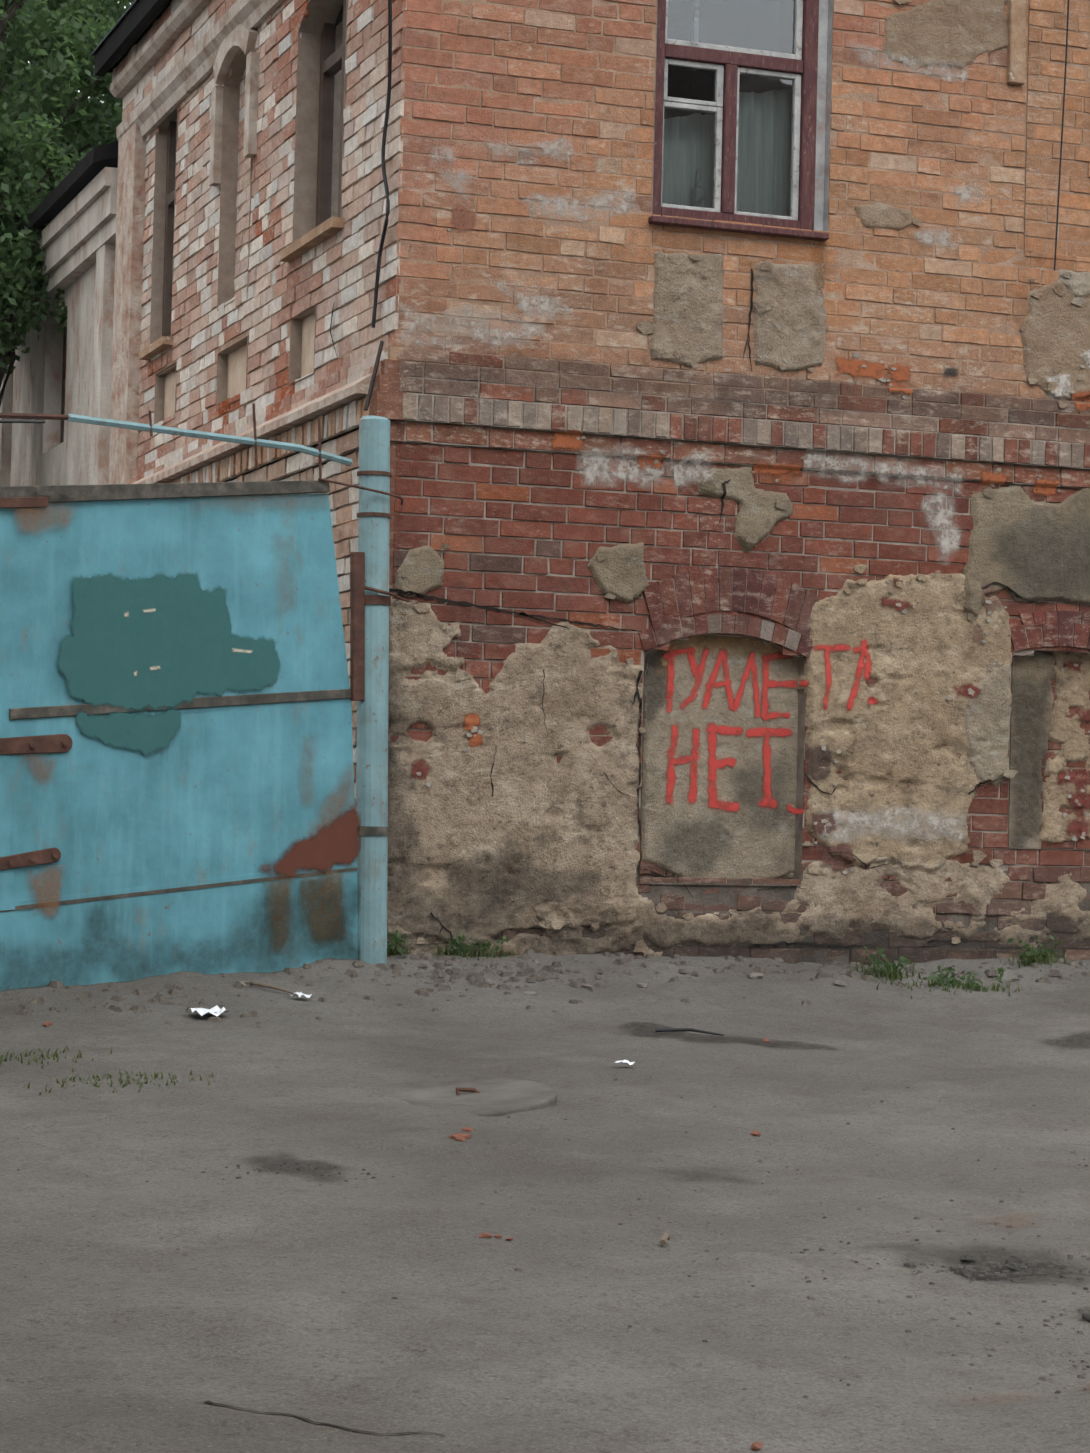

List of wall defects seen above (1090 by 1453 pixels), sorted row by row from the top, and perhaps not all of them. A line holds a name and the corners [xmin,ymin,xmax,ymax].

crack [743,268,754,372]
spalling [552,424,586,450]
spalling [637,450,666,468]
peeling [387,457,1090,957]
rust [260,807,361,948]